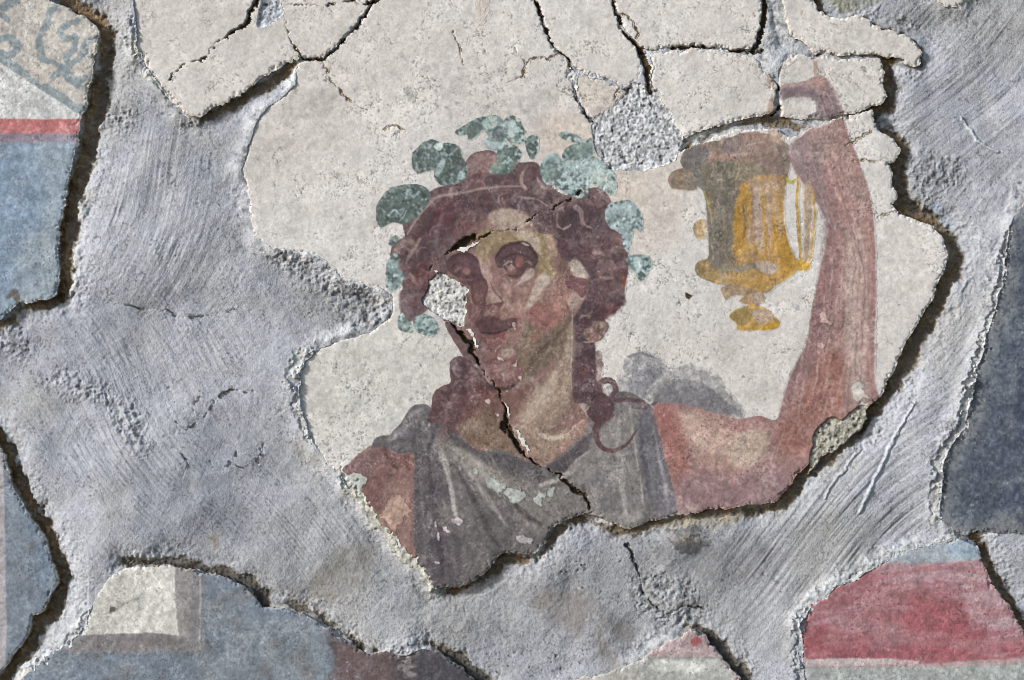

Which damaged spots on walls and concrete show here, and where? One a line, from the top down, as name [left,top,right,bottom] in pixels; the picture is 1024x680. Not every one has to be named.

crack [225,0,259,39]
crack [294,0,380,101]
crack [522,0,593,122]
crack [612,0,764,95]
spalling [592,83,683,171]
spalling [0,324,156,460]
spalling [270,250,393,337]
spalling [423,274,469,327]
crack [451,324,480,366]
crack [499,389,590,510]
spalling [791,231,1013,680]
spalling [624,567,704,631]